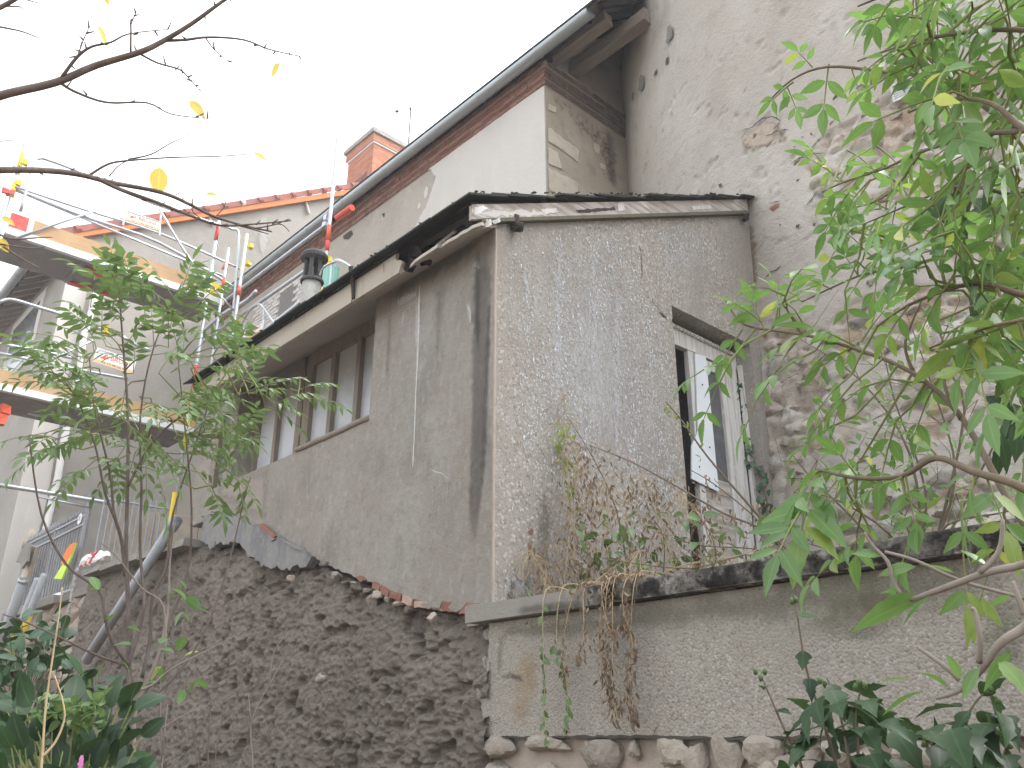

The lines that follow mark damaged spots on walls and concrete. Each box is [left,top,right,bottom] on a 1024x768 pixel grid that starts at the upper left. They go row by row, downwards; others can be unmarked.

flaking render [741,116,788,148]
damp [928,531,1004,551]
damp [805,543,907,572]
damp [604,561,765,602]